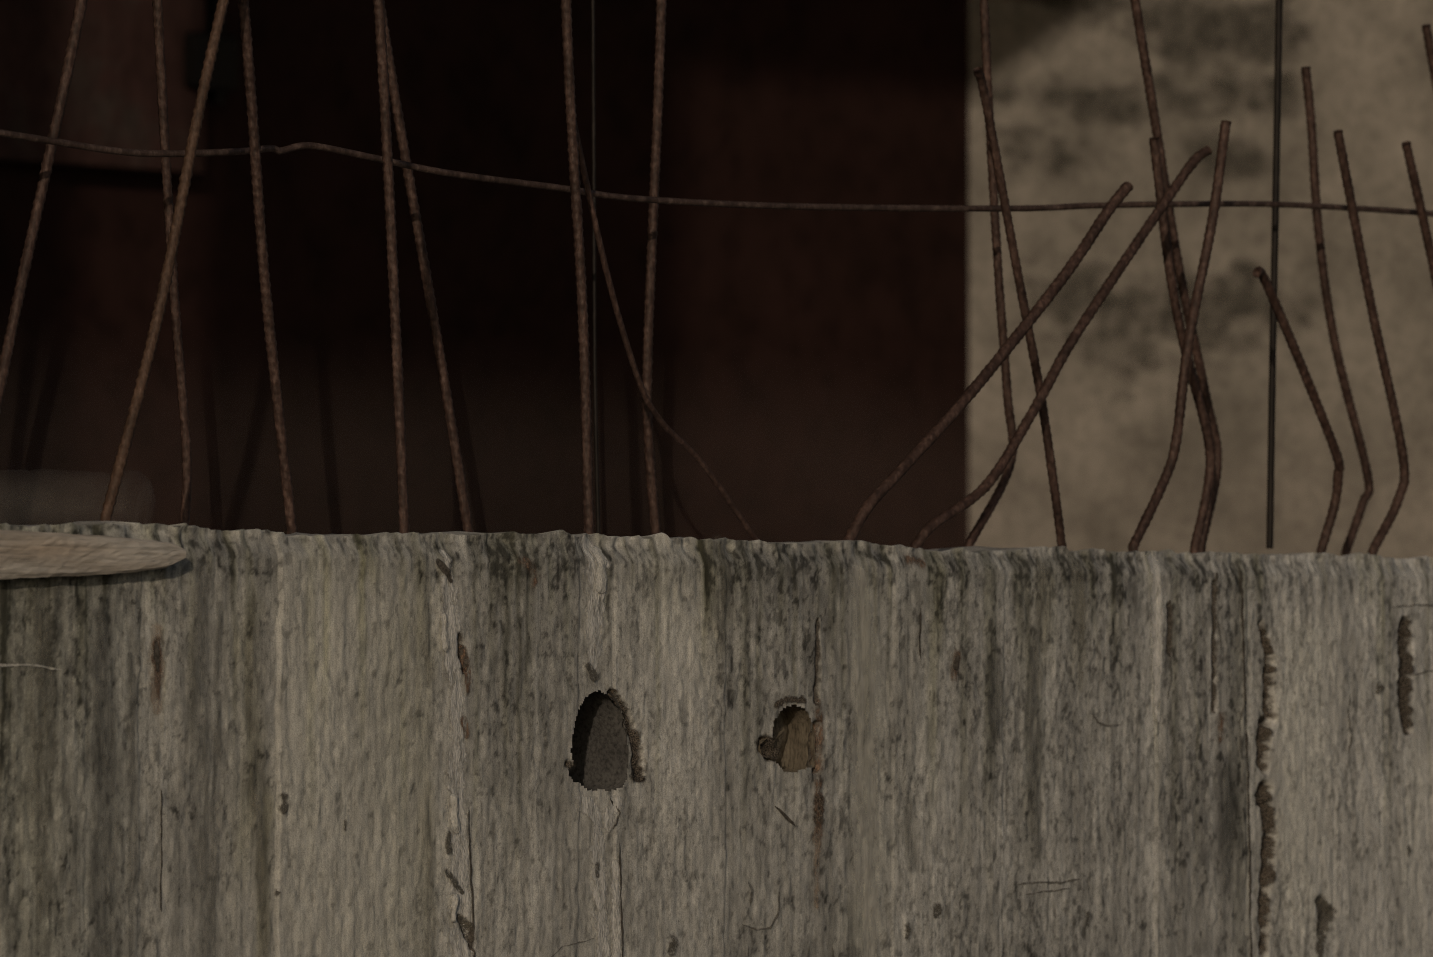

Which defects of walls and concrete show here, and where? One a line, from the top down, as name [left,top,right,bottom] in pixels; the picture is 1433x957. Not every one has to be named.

rust [151,637,163,713]
spalling [607,688,645,782]
spalling [757,736,780,761]
spalling [774,695,806,708]
rust [809,617,824,908]
spalling [575,793,622,834]